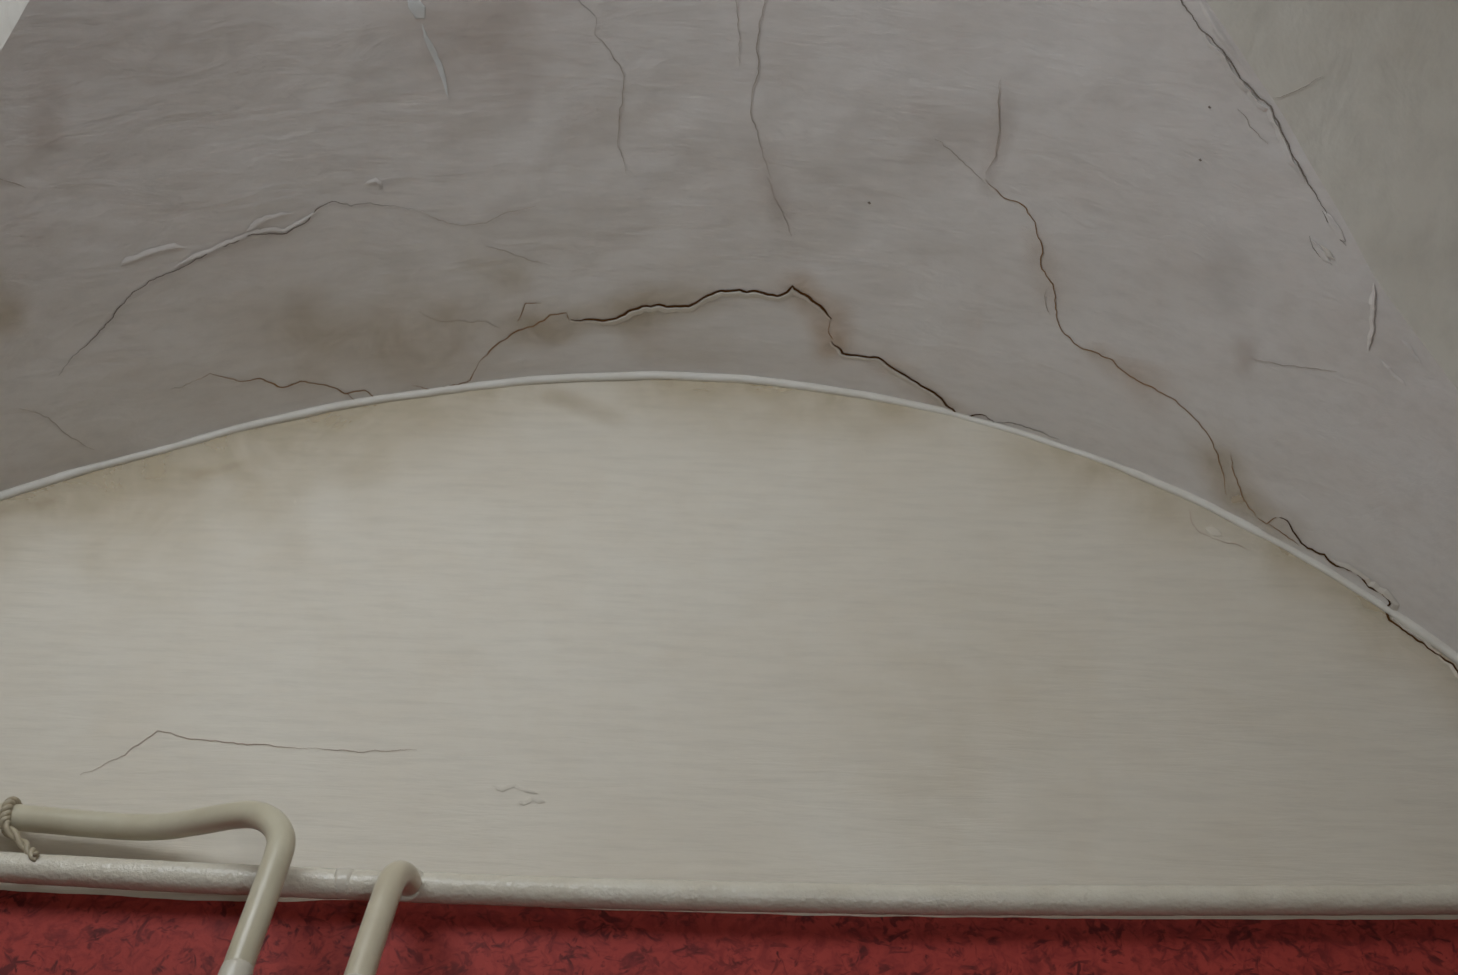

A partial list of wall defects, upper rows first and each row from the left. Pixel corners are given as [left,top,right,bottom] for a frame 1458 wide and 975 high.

crack [579,1,626,169]
crack [736,2,792,236]
crack [1180,0,1327,213]
crack [172,373,373,400]
crack [59,201,549,375]
crack [417,285,1057,439]
crack [938,82,1458,679]